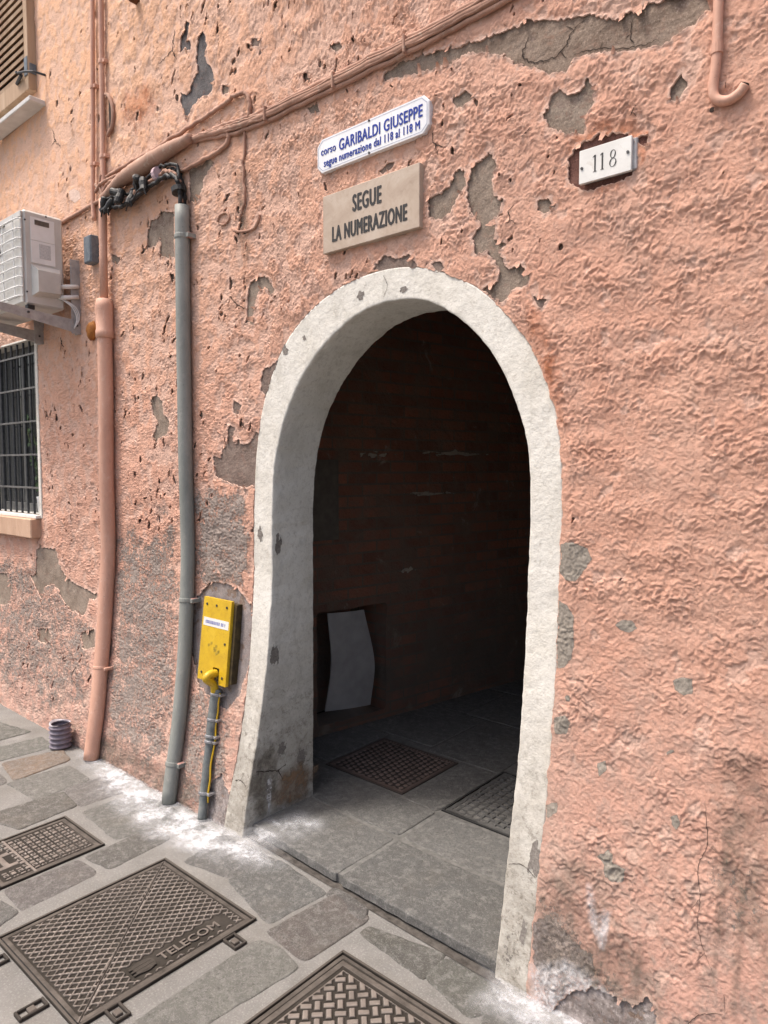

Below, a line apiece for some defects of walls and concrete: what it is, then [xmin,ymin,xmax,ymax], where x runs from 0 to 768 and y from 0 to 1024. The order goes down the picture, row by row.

peeling [178,22,230,121]
spalling [381,0,713,88]
peeling [543,79,650,191]
peeling [146,211,175,259]
peeling [425,154,531,302]
peeling [244,274,276,325]
flaking render [194,401,259,590]
peeling [559,542,592,581]
flaking render [0,545,97,716]
peeling [556,601,574,668]
spalling [519,898,657,1024]